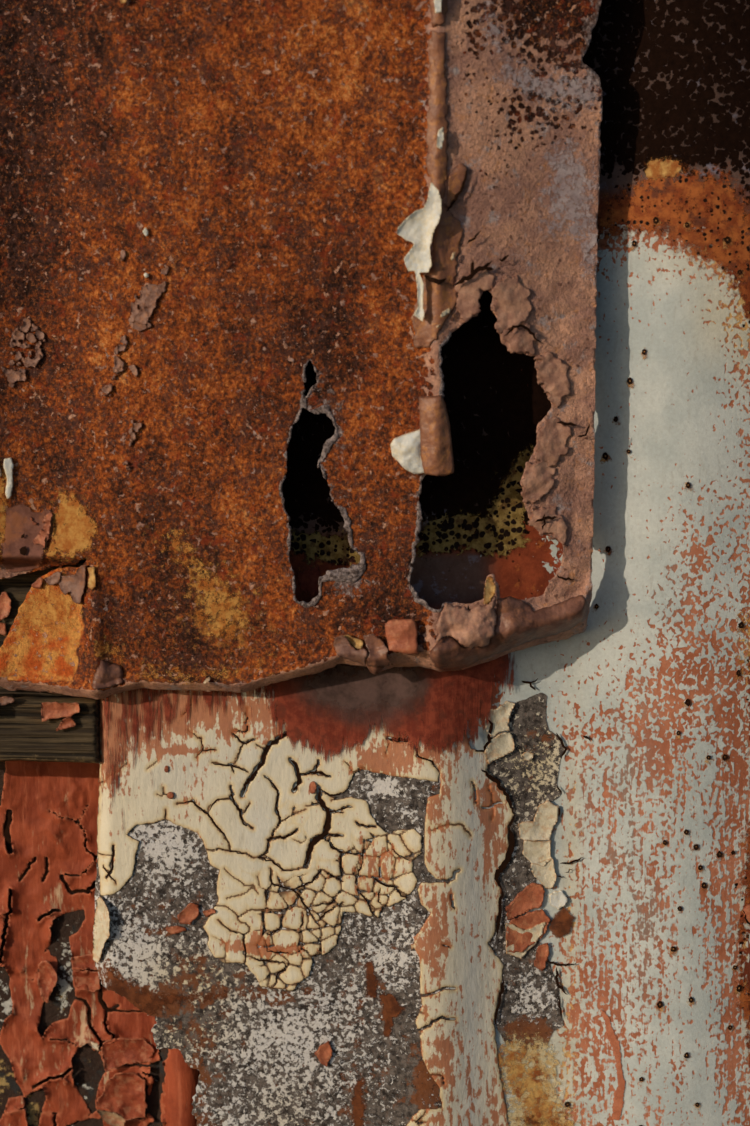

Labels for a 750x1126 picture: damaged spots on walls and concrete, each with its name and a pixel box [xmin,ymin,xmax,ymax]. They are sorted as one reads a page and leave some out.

peeling [397,183,442,321]
corrosion [0,0,750,818]
peeling [0,458,14,499]
peeling [483,576,496,605]
crack [387,737,439,771]
crack [0,812,116,962]
crack [164,704,410,989]
spalling [0,677,575,1126]
corrosion [735,822,750,1057]
crack [33,1068,70,1088]
corrosion [498,1041,573,1126]
corrosion [601,1009,626,1120]